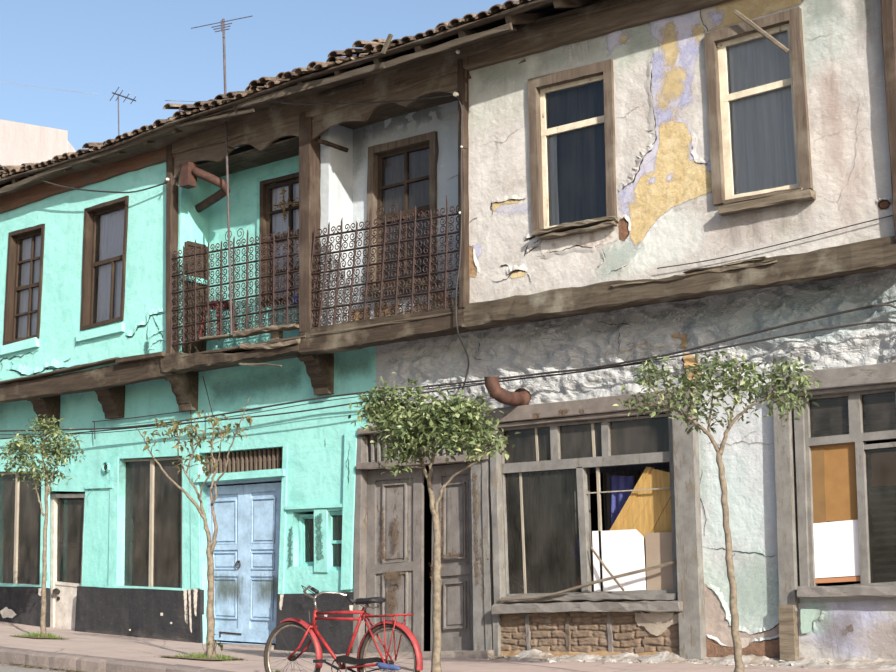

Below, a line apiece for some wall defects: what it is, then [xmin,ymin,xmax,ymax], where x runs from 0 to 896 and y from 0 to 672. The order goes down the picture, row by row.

peeling [490,0,803,282]
crack [815,90,870,220]
spalling [874,197,892,209]
crack [125,306,166,352]
crack [0,345,80,376]
peeling [672,331,706,383]
crack [706,547,775,557]
peeling [0,607,17,618]
peeling [183,589,198,633]
flaking render [704,582,780,659]